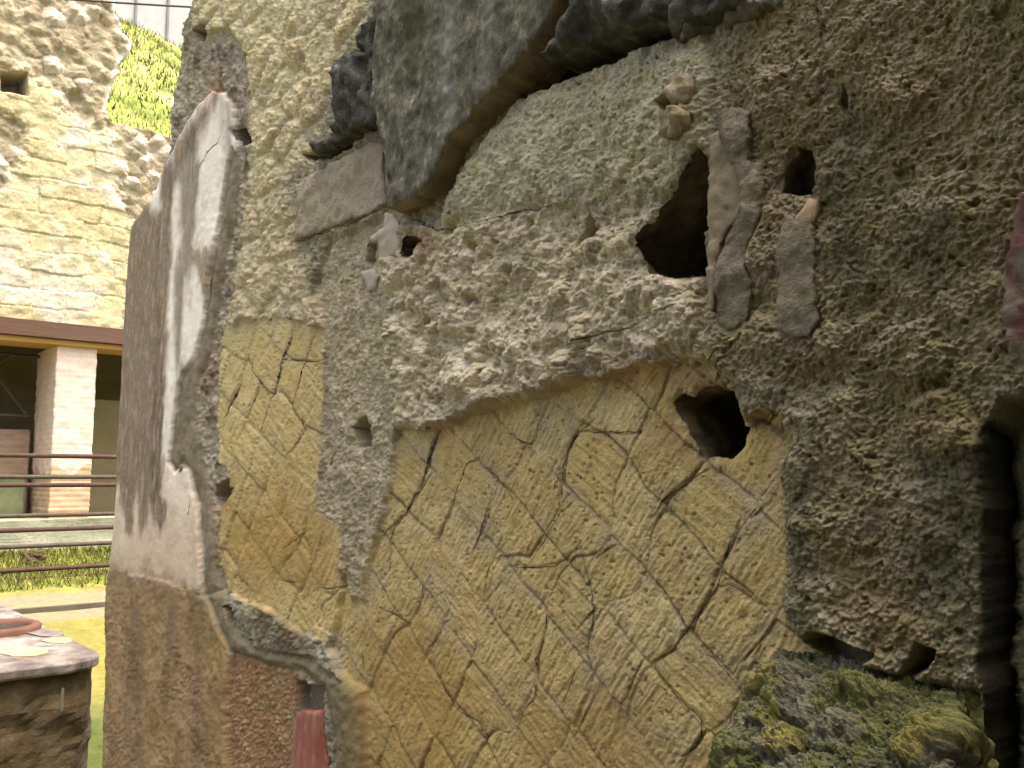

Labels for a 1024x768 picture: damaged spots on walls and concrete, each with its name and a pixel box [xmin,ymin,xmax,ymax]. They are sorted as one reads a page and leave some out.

crack [407,194,575,231]
damp [116,106,216,533]
crack [224,338,323,456]
spalling [171,0,875,768]
crack [383,439,437,574]
crack [453,418,632,650]
crack [651,468,708,516]
crack [425,632,489,745]
crack [517,614,547,730]
crack [573,503,774,757]
spalling [896,643,937,679]